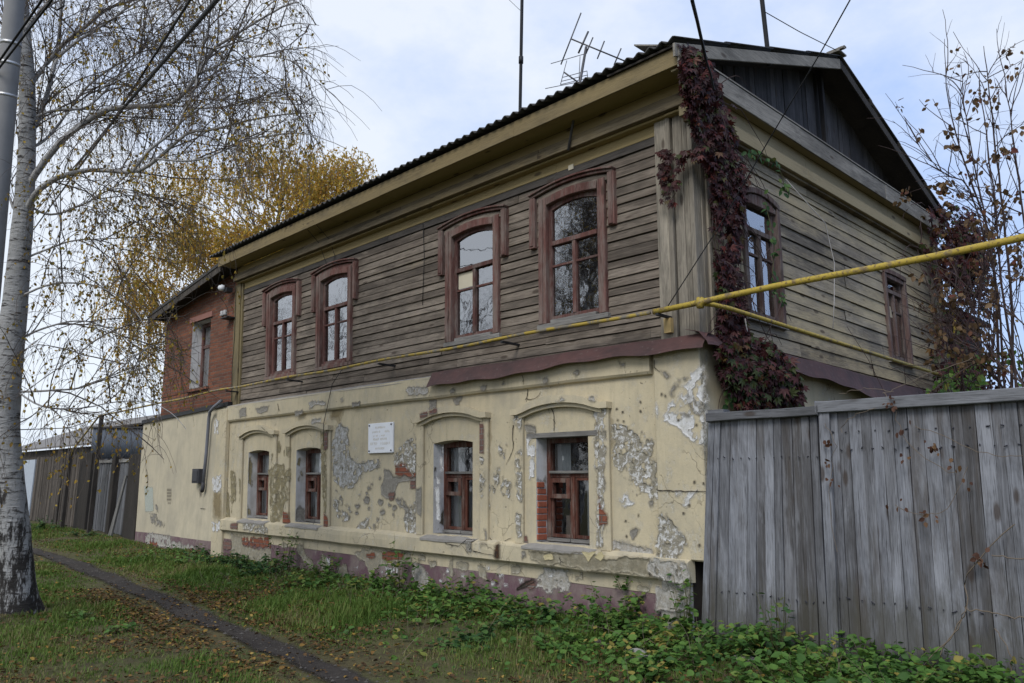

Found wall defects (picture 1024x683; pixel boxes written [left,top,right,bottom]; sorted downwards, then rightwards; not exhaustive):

peeling [656,367,708,451]
peeling [212,442,348,577]
peeling [320,424,421,534]
peeling [355,396,704,636]